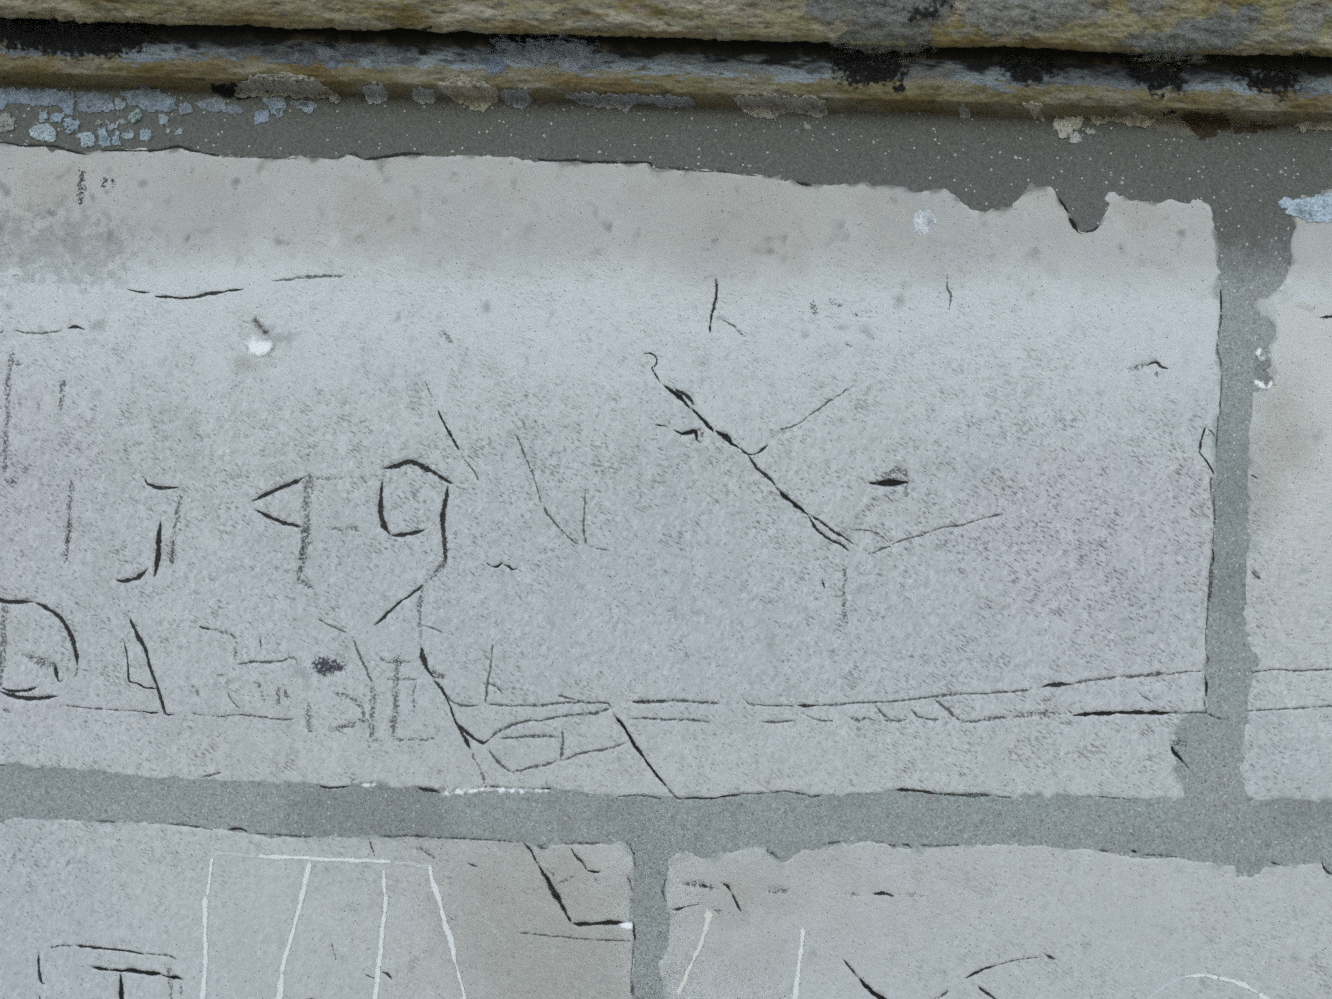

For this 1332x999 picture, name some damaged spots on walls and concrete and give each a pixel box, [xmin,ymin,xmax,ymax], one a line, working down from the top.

crack [664,385,853,550]